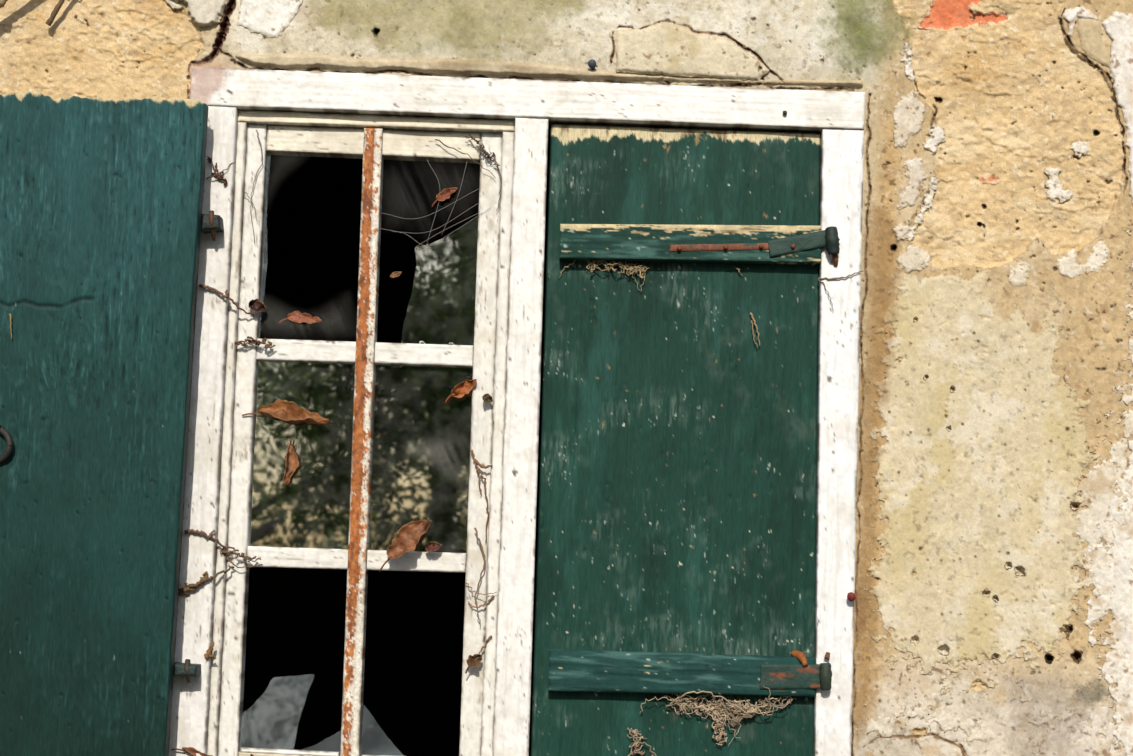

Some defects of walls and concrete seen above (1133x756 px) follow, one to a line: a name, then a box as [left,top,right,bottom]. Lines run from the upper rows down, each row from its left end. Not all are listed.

spalling [0,0,303,101]
crack [187,0,534,99]
crack [1059,9,1128,195]
crack [563,19,968,756]
peeling [857,0,1133,756]